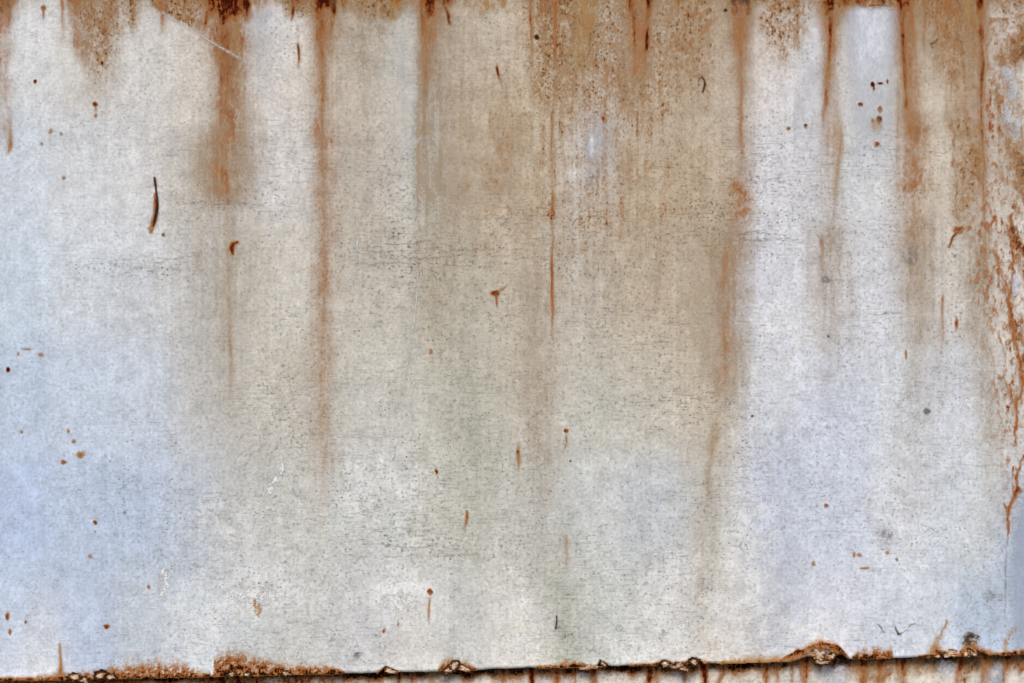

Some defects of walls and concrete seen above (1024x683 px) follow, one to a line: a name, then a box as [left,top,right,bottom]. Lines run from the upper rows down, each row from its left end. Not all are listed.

corrosion [60,0,454,322]
corrosion [474,0,1019,326]
corrosion [0,621,1024,683]